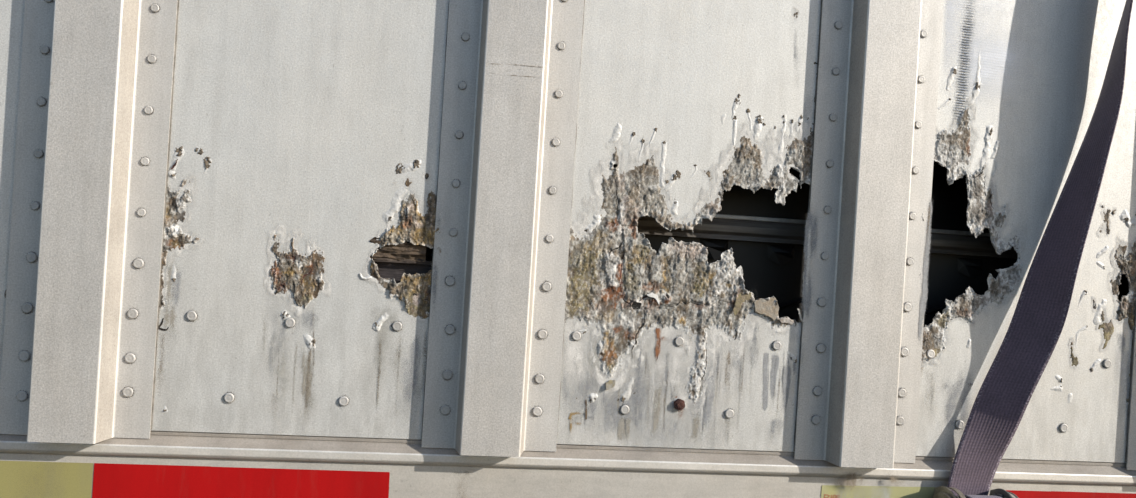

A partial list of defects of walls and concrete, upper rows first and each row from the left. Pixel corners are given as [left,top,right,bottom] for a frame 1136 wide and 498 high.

corrosion [263,224,332,317]
corrosion [564,7,815,421]
leakage [801,208,819,320]
leakage [257,299,320,424]
leakage [559,314,805,454]